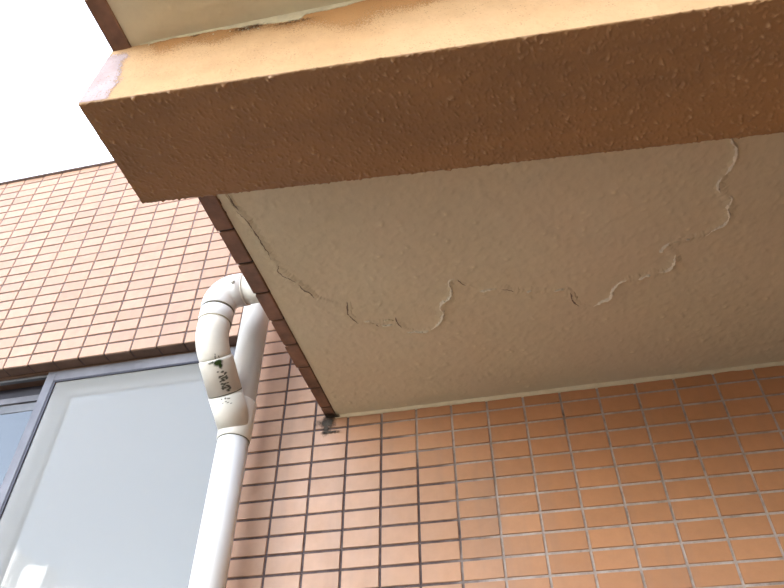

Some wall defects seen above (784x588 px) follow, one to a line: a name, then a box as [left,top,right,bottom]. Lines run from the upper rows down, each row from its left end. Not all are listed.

crack [225,194,478,334]
crack [594,138,740,306]